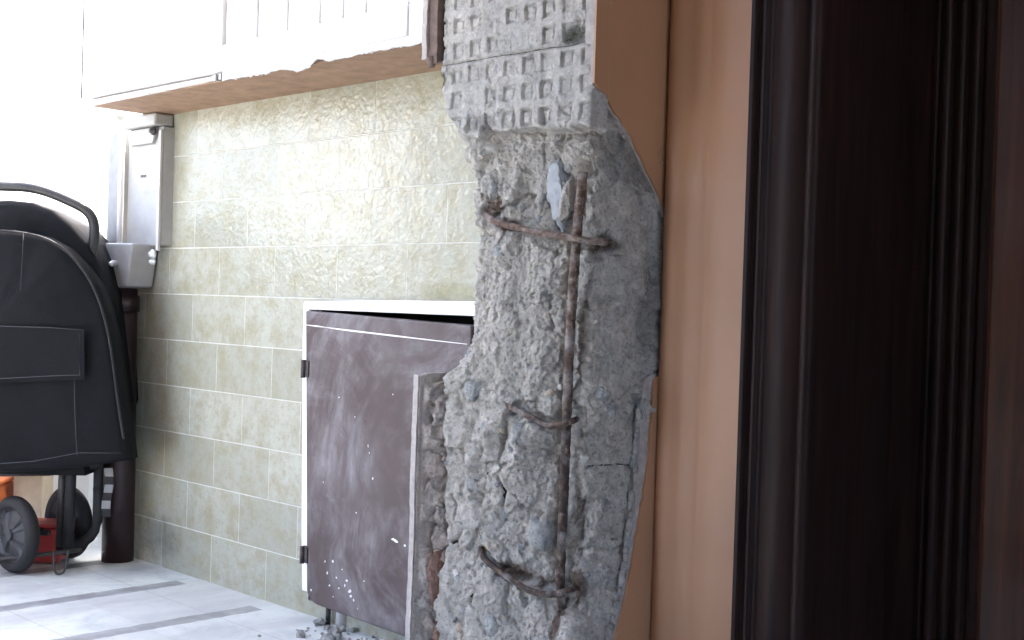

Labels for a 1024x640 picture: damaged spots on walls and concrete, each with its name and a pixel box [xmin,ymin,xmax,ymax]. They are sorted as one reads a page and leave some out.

rust [485,197,519,230]
rust [589,235,620,256]
spalling [433,118,664,640]
rust [485,549,546,586]
rust [550,572,587,639]